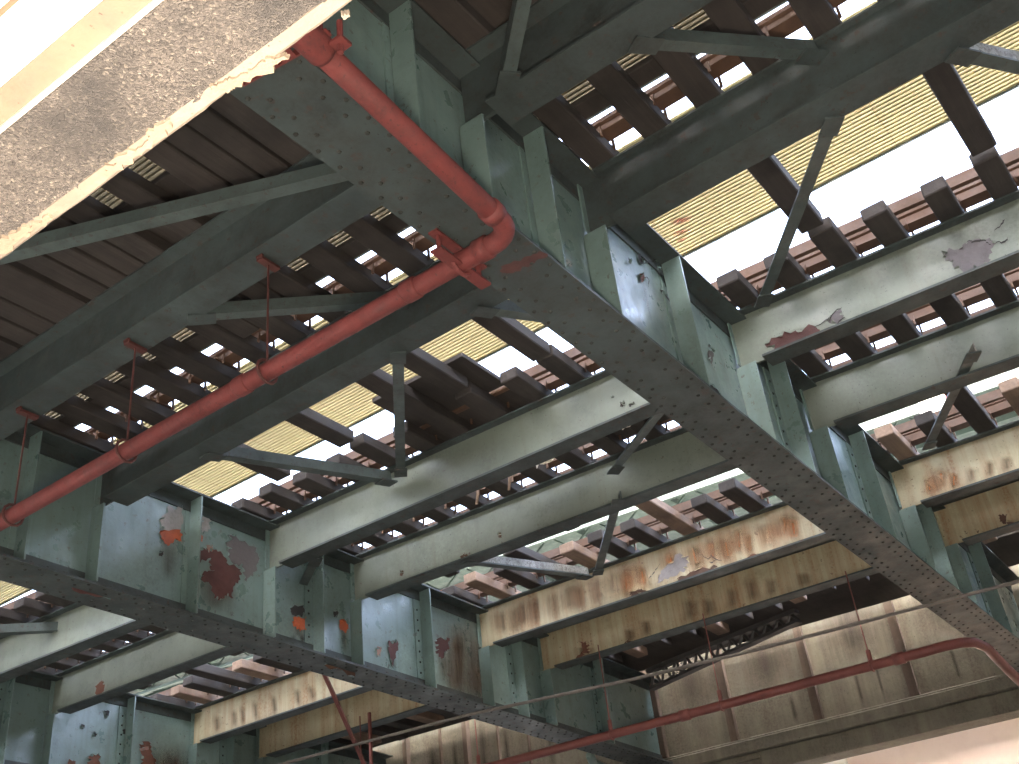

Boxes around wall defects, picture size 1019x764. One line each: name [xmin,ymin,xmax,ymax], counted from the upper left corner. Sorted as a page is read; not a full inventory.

peeling [941,238,996,272]
peeling [827,309,843,324]
peeling [159,505,183,556]
peeling [200,515,260,601]
peeling [657,553,689,583]
corrosion [677,531,757,580]
peeling [290,605,306,631]
peeling [435,637,450,659]